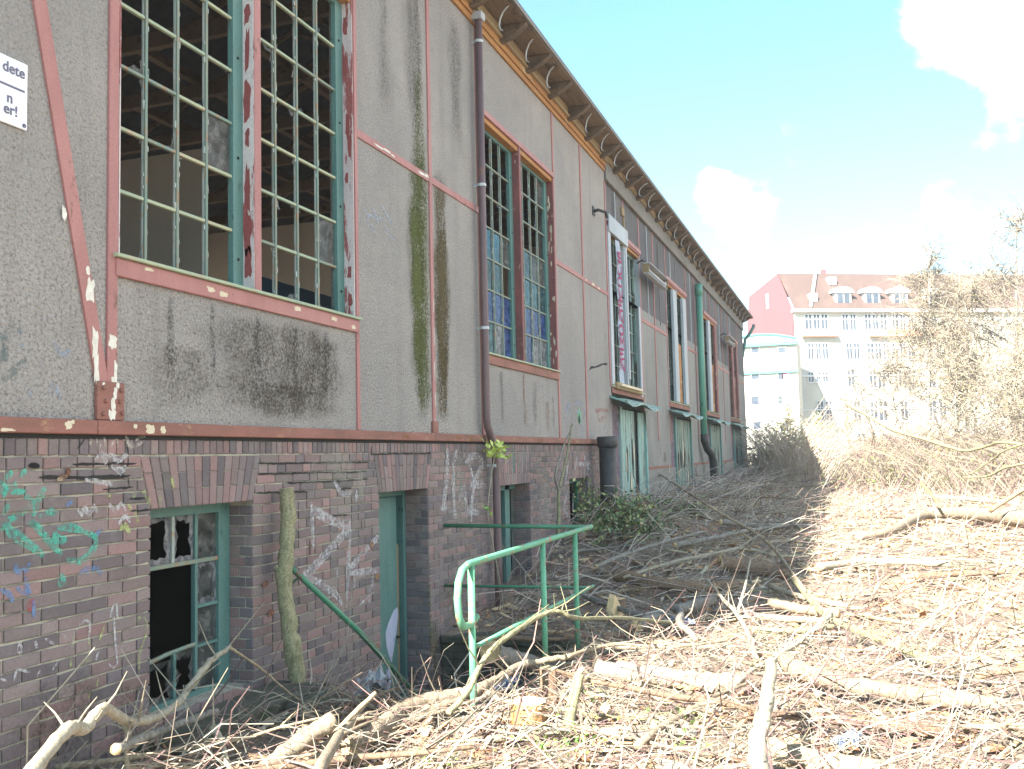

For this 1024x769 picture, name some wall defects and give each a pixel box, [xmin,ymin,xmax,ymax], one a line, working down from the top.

peeling [243,4,251,147]
peeling [243,163,252,278]
damp [408,0,450,413]
peeling [86,266,95,302]
peeling [92,327,120,420]
peeling [134,424,166,434]